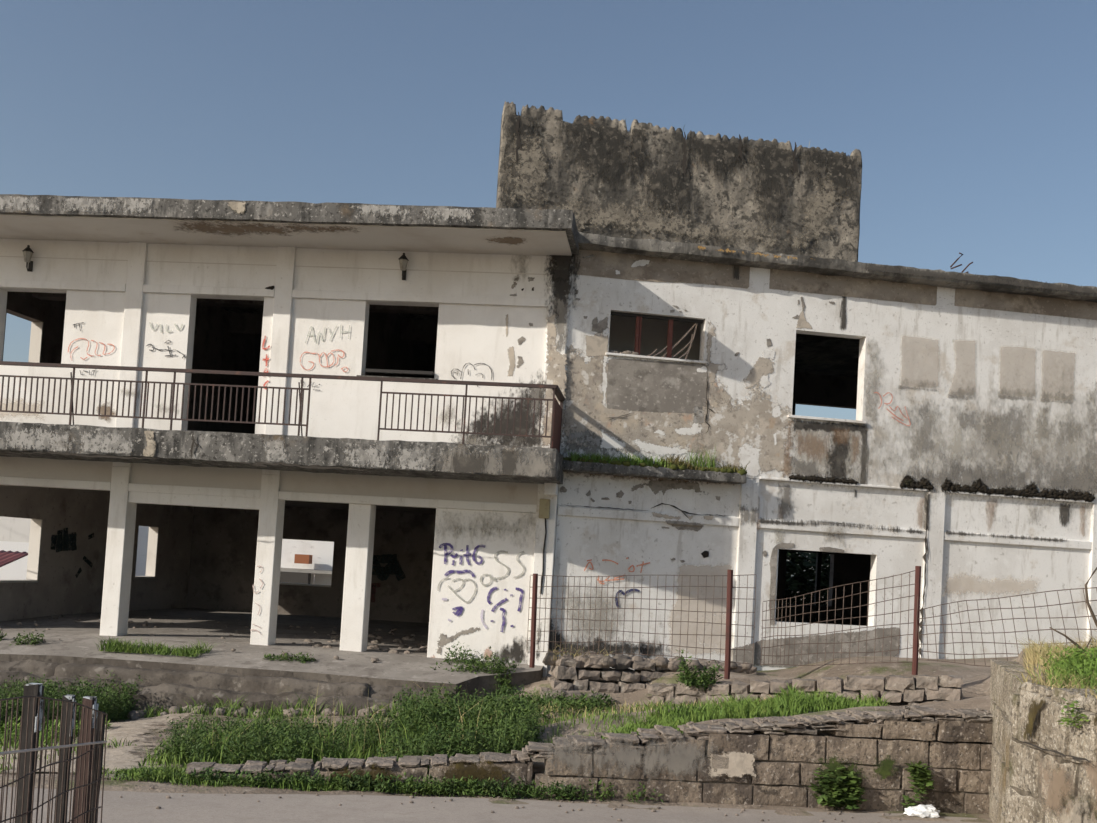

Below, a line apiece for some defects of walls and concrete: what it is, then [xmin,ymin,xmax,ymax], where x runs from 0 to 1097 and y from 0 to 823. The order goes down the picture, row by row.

leakage [64,198,152,214]
leakage [560,123,861,223]
peeling [506,314,533,376]
leakage [546,254,580,351]
flaking render [573,249,750,288]
leakage [143,430,156,457]
leakage [431,376,627,477]
peeling [586,479,702,504]
peeling [541,315,794,478]
spalling [653,512,714,531]
leakage [870,403,1097,542]
crack [919,498,929,658]